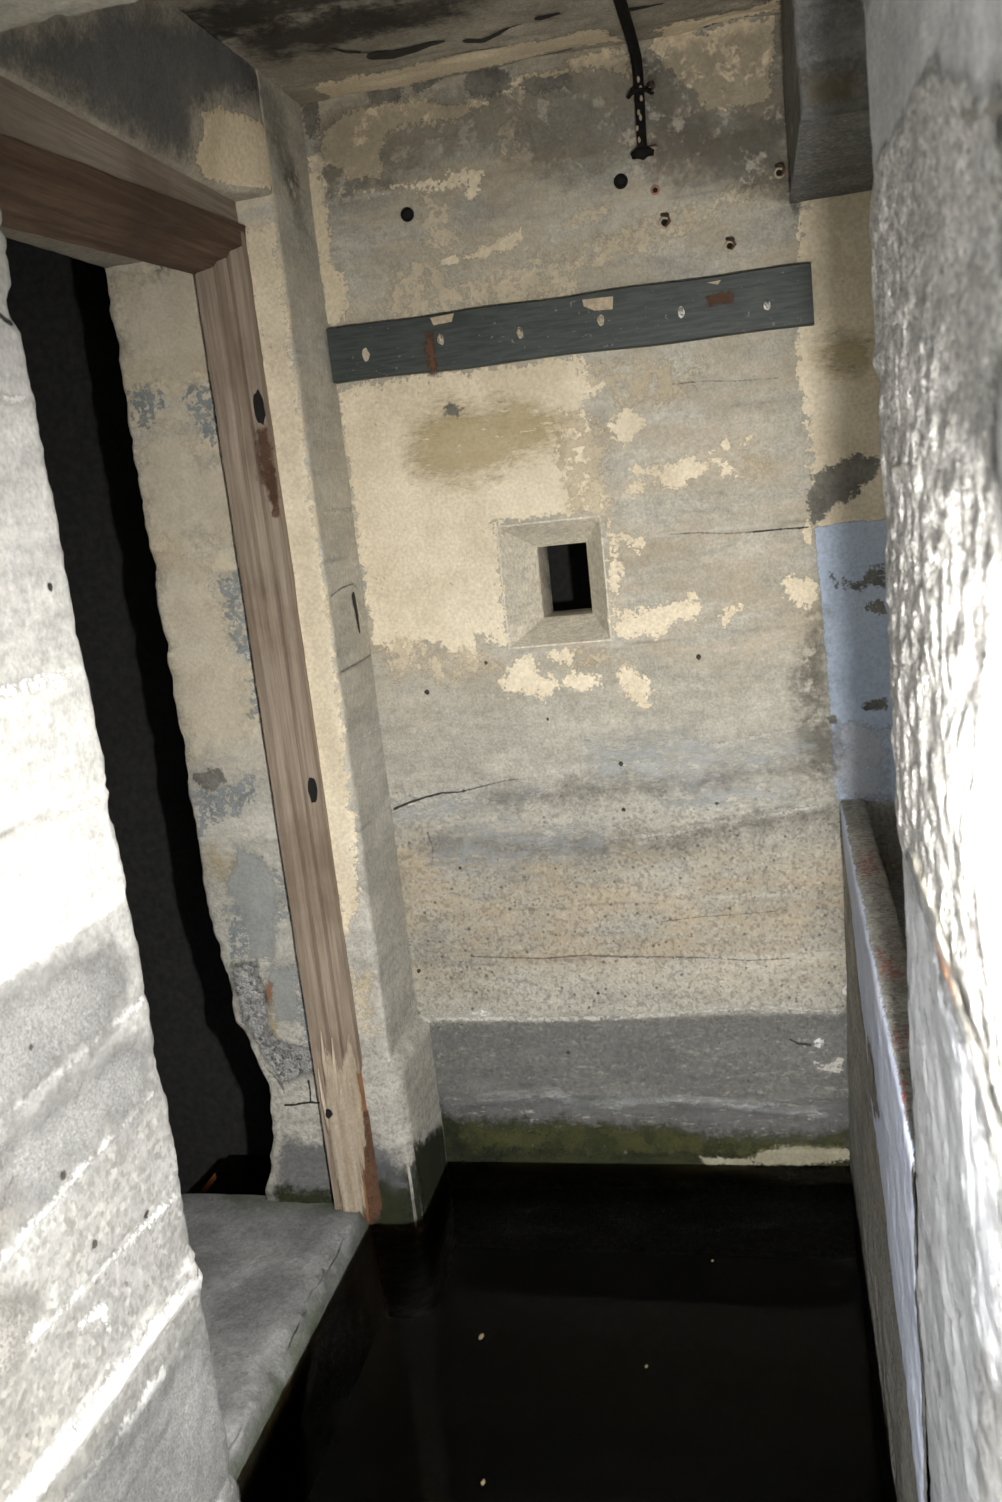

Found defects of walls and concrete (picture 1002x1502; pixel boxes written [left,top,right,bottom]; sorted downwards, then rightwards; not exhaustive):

water stain [0,0,476,153]
peeling [301,0,782,328]
corrosion [255,427,279,517]
peeling [337,354,772,721]
crack [391,779,514,854]